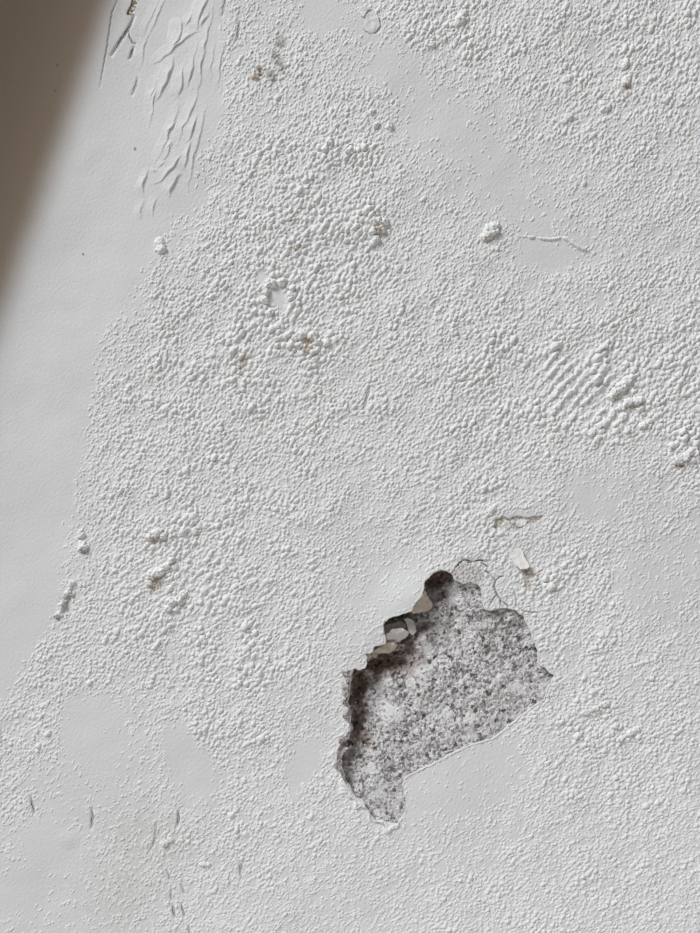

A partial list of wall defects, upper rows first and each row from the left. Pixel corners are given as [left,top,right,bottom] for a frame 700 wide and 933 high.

spalling [334,560,556,834]